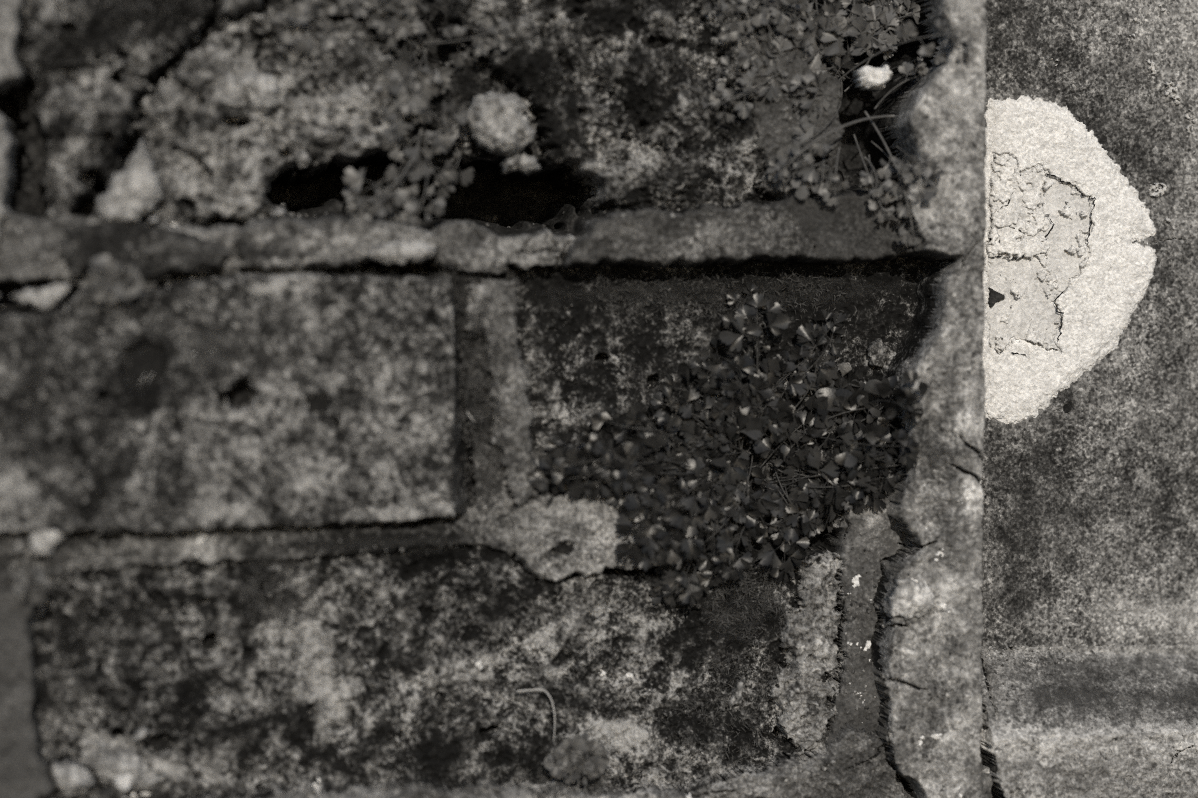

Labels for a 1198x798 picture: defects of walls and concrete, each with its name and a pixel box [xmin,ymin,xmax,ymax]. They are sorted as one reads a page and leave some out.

peeling [982,95,1157,424]
crack [948,437,984,502]
crack [834,541,935,776]
crack [981,658,996,716]